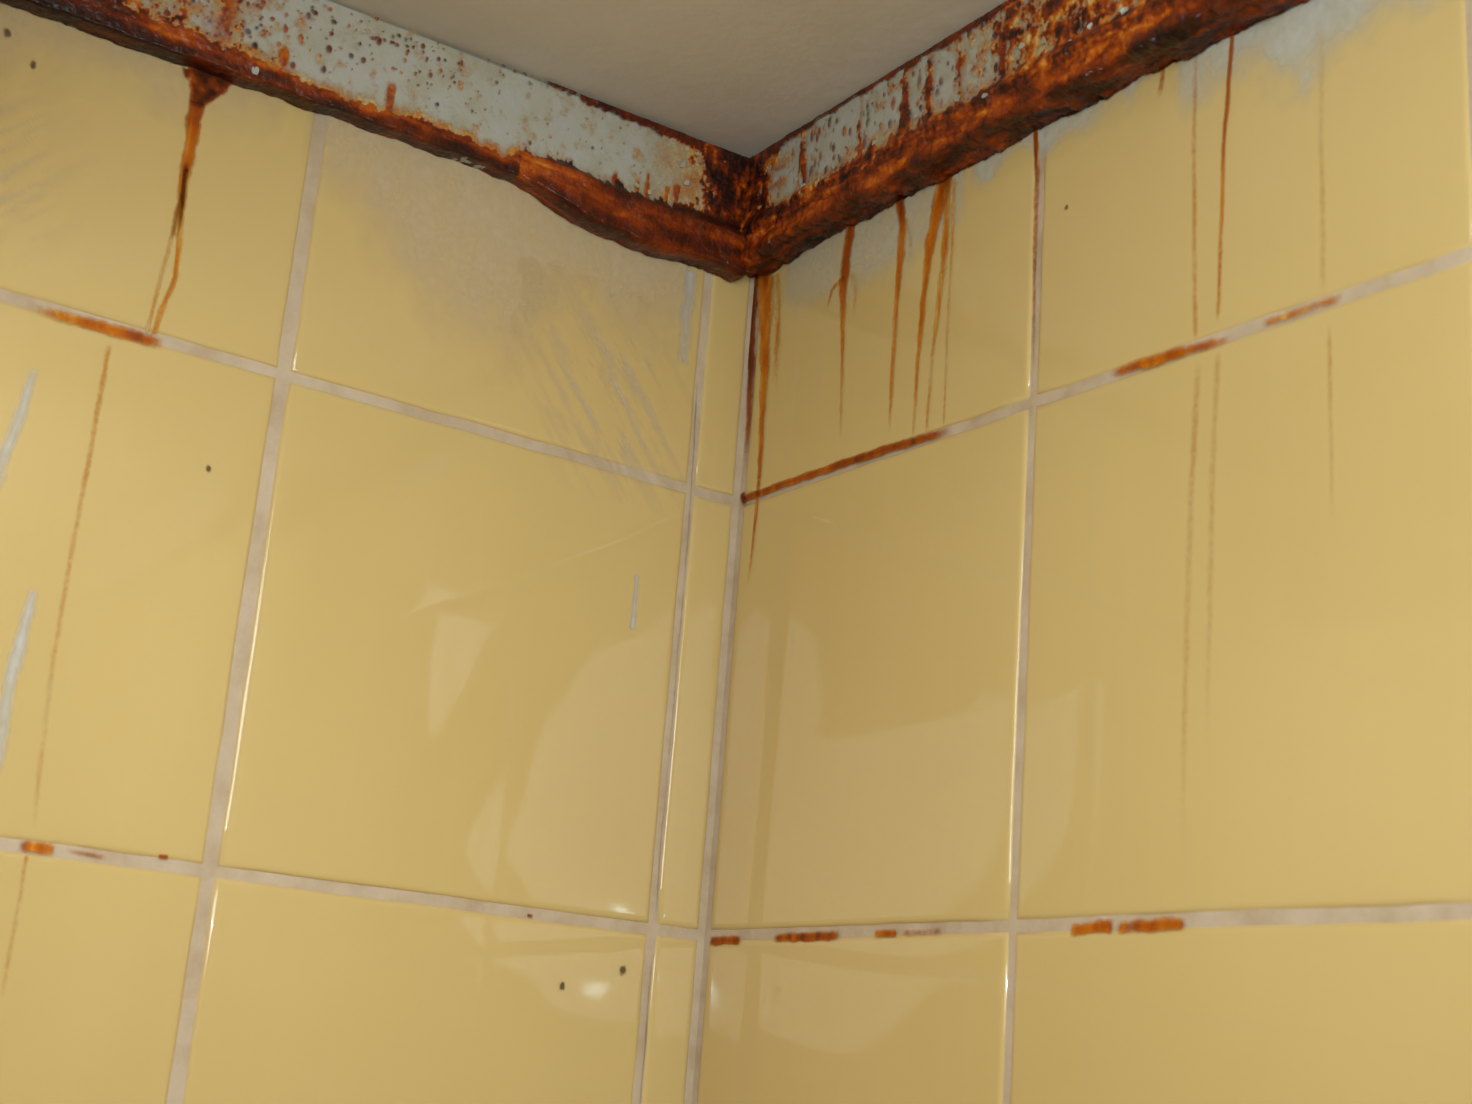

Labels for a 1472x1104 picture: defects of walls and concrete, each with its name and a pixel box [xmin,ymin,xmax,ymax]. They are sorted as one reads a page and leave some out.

corrosion [0,0,531,401]
corrosion [547,0,1309,564]
corrosion [1268,298,1335,324]
corrosion [711,936,739,946]
corrosion [776,931,837,942]
corrosion [875,929,919,937]
corrosion [1071,917,1183,936]